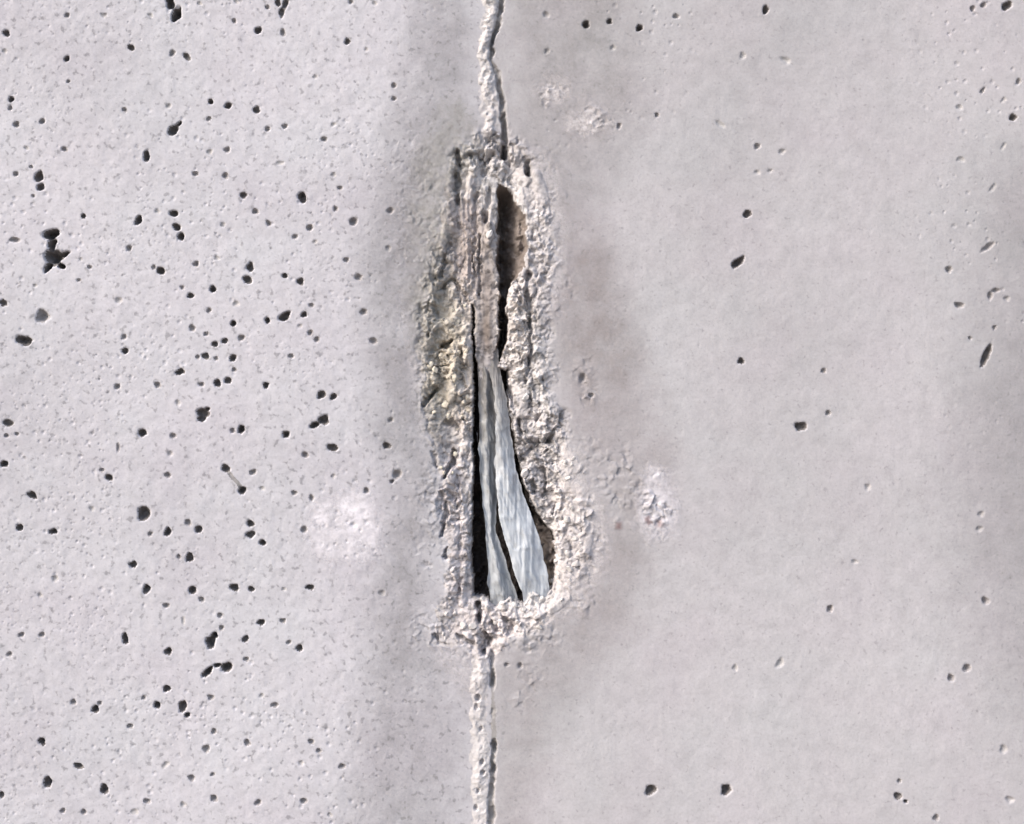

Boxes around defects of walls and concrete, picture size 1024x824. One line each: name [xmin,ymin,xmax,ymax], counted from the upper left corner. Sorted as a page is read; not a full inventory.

crack [476,0,507,144]
spalling [414,131,593,658]
crack [467,650,497,824]